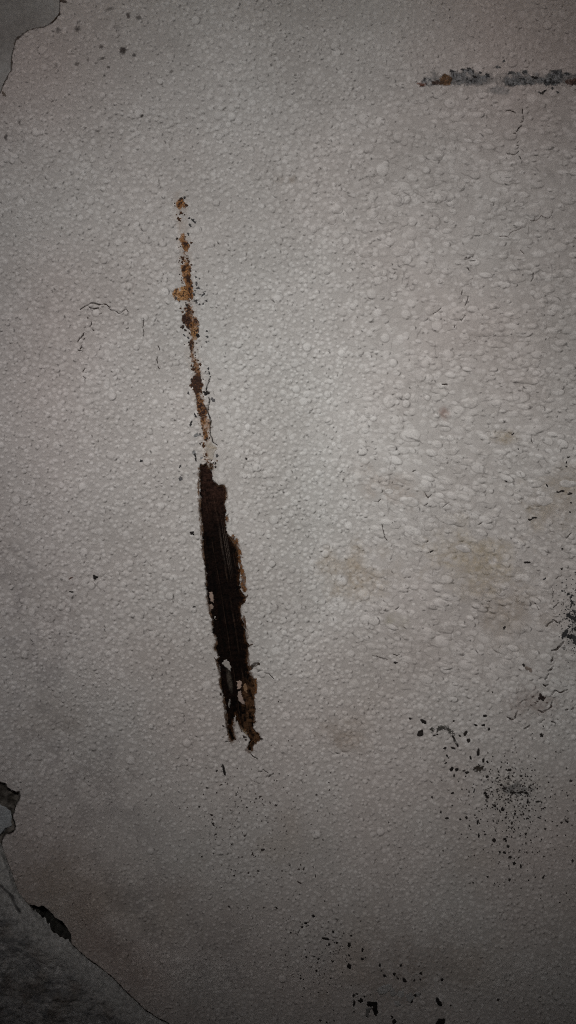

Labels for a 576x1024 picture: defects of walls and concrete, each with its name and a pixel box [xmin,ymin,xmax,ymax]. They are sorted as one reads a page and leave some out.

peeling [0,0,66,96]
rust [172,196,274,758]
spalling [0,782,169,1024]